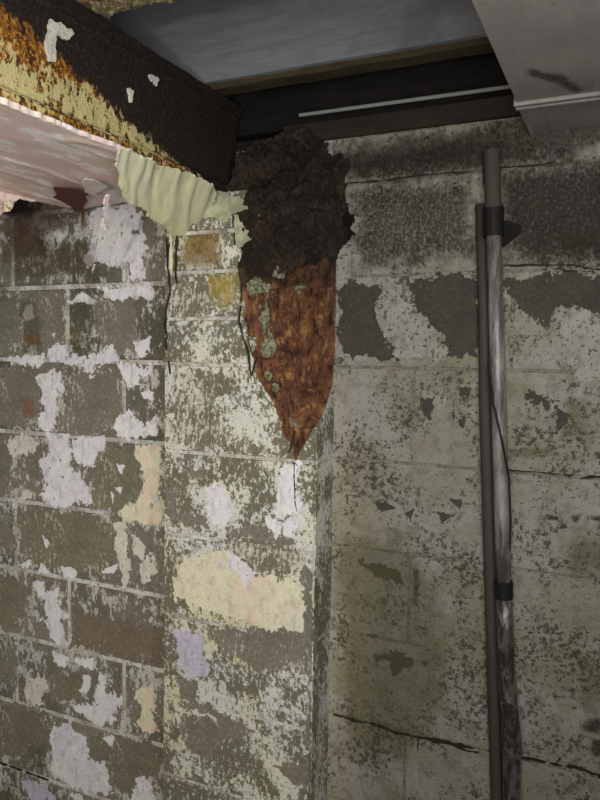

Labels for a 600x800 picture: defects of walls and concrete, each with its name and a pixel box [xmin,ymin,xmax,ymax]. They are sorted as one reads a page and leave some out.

damp [344,122,600,267]
peeling [503,268,600,384]
spalling [0,97,479,800]
crack [333,714,478,753]
crack [522,757,600,777]